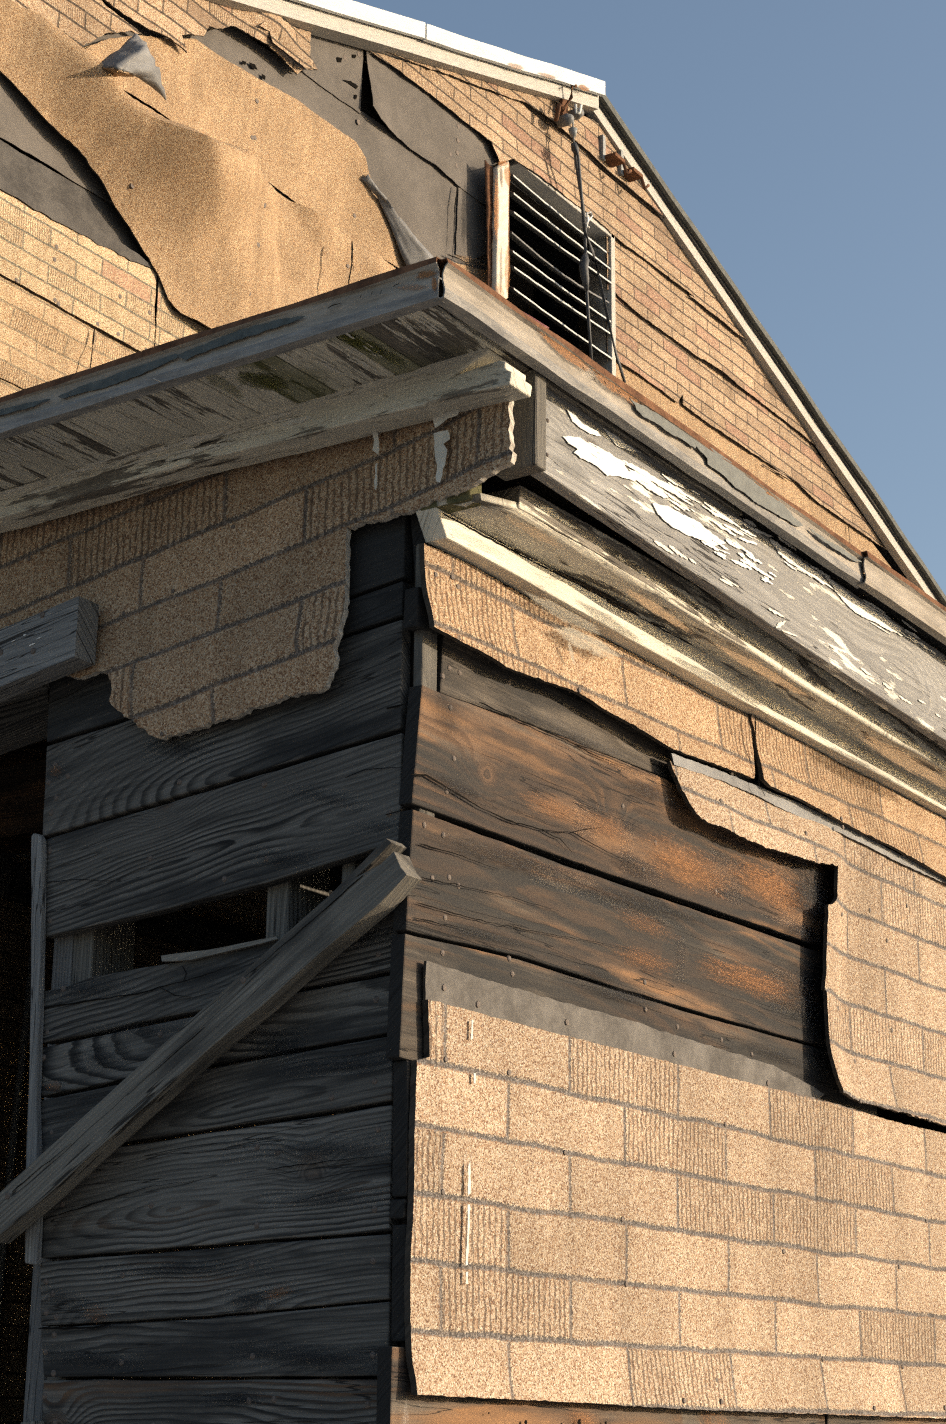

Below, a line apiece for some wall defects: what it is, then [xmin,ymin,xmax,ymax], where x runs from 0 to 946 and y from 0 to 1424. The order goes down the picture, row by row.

peeling [0,316,312,495]
peeling [553,398,936,655]
peeling [860,667,941,718]